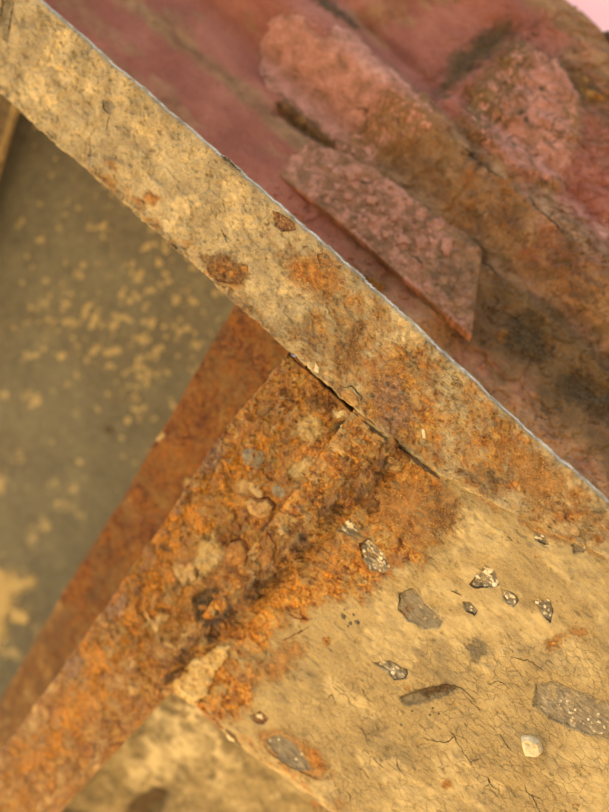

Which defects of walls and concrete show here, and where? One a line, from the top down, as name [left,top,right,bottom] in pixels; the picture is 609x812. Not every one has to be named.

corrosion [208,252,249,284]
corrosion [289,255,340,296]
corrosion [363,274,386,292]
corrosion [334,321,364,370]
crack [361,419,440,479]
corrosion [0,304,305,751]
corrosion [365,479,457,545]